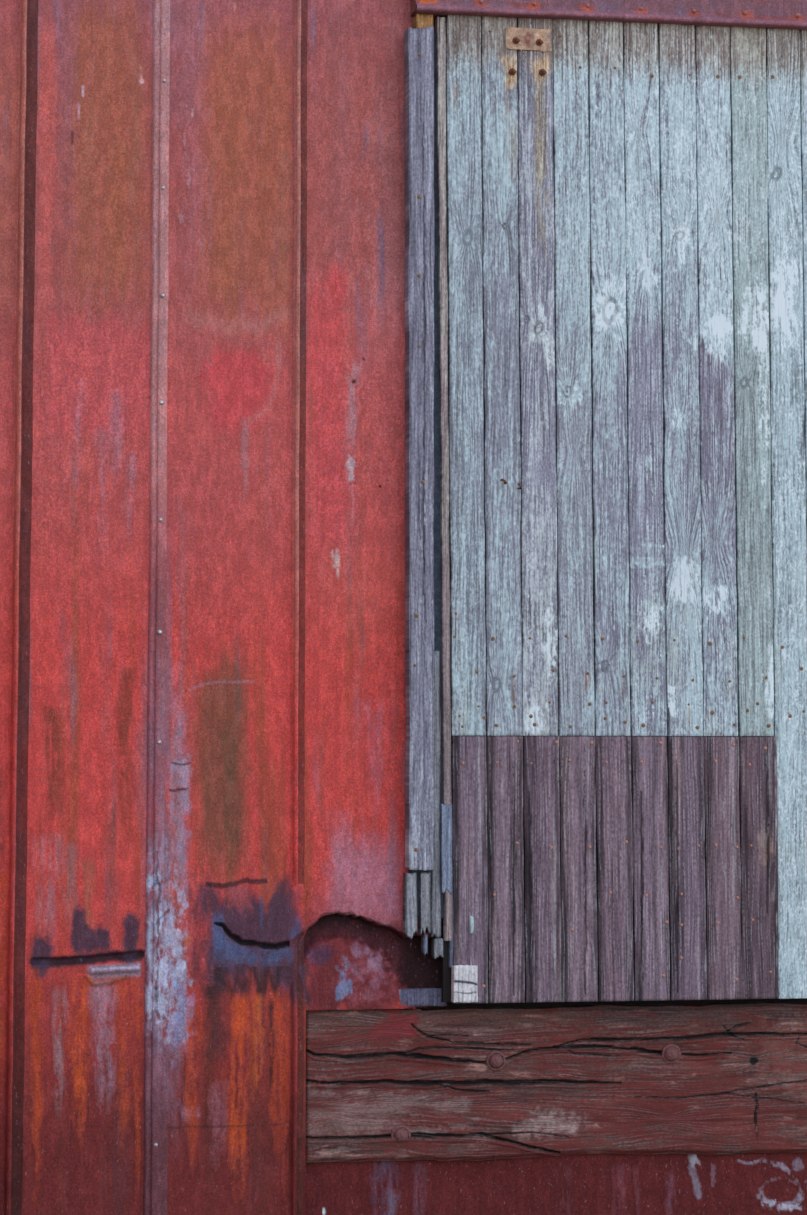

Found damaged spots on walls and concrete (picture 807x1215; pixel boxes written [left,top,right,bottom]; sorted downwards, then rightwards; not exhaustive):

peeling [144,684,308,1071]
peeling [330,935,423,1046]
crack [306,1022,807,1137]
crack [306,1131,569,1154]